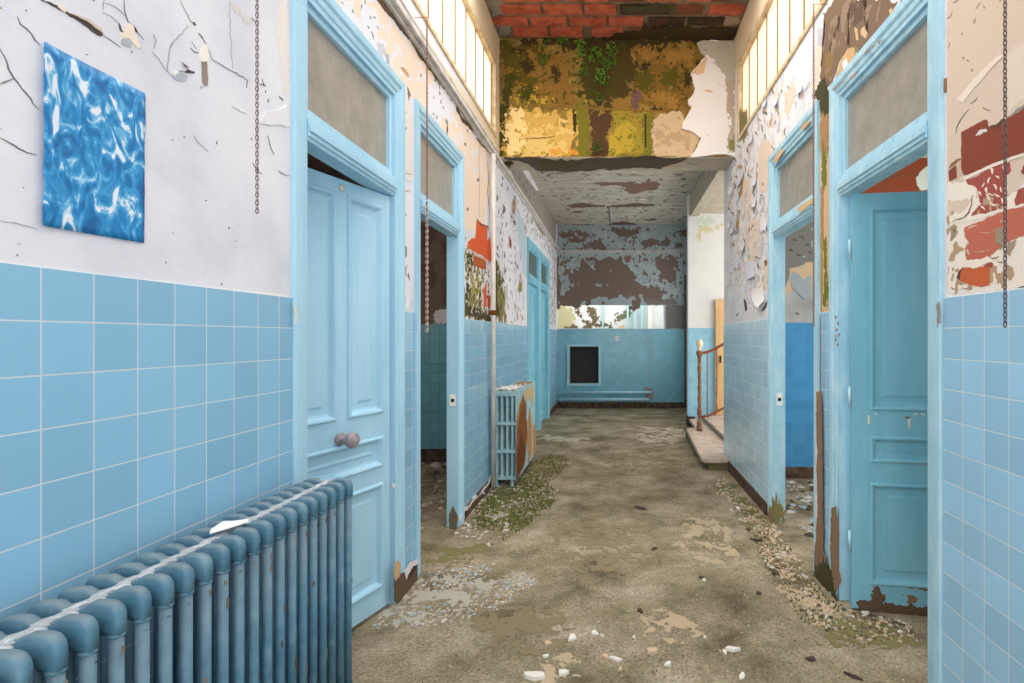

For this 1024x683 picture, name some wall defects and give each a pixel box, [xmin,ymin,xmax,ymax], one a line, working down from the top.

crack [0,49,39,110]
crack [41,0,283,114]
water stain [500,38,721,157]
flaking render [335,0,823,329]
flaking render [936,0,1024,328]
peeling [785,153,840,346]
spalling [394,559,418,602]
peeling [883,583,928,604]